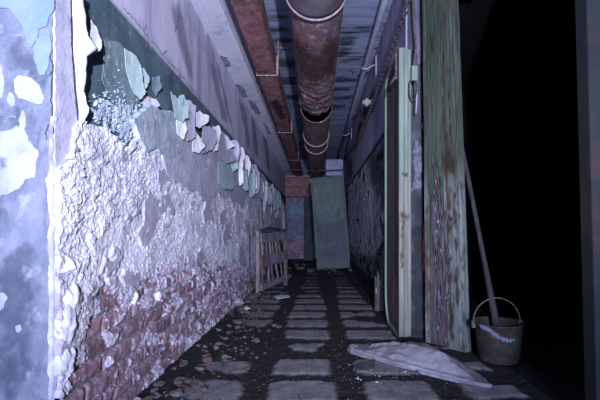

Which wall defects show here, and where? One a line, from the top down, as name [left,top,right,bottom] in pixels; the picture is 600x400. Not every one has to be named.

flaking render [0,0,304,400]